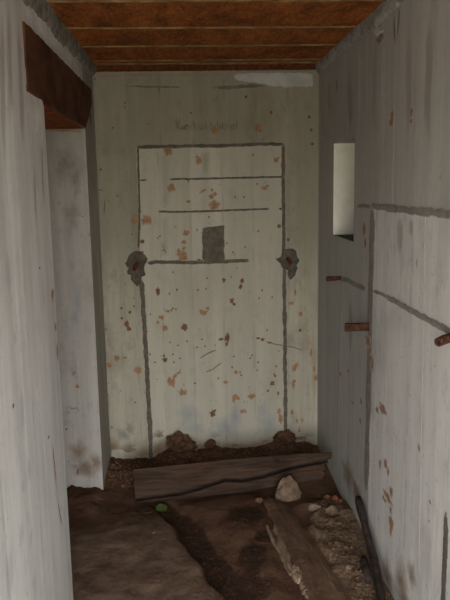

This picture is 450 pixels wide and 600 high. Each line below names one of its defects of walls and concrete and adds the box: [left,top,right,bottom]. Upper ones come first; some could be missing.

spalling [125,251,148,287]
spalling [276,248,299,280]
rust [166,370,188,396]
leakage [64,433,102,482]
rust [382,485,394,539]